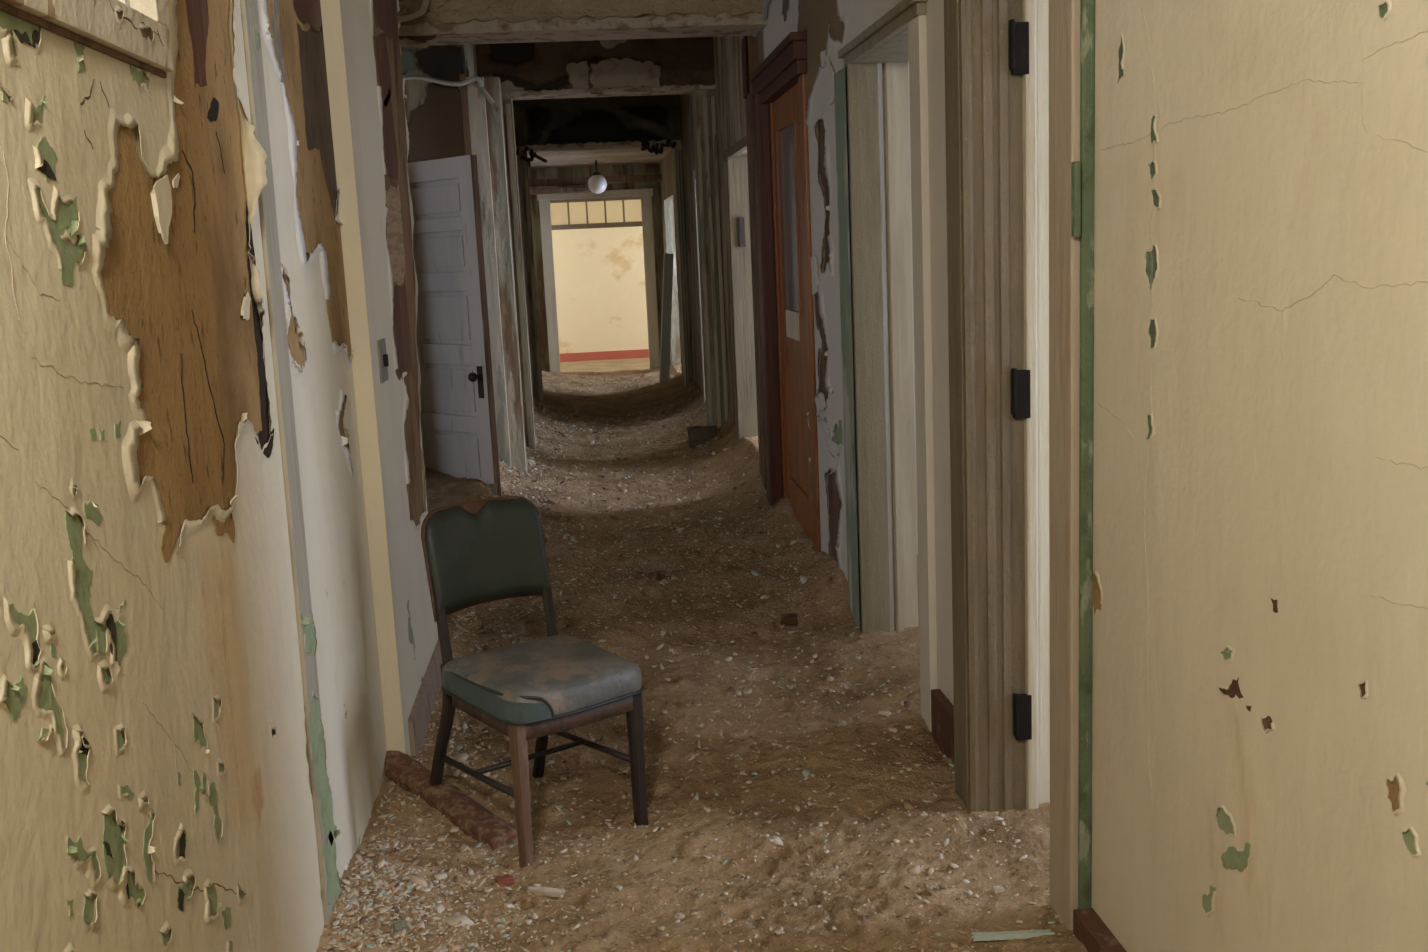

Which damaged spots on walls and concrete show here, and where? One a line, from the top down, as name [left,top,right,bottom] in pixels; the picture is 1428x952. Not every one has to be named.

crack [1095,30,1428,153]
flaking render [0,0,356,563]
flaking render [369,0,767,532]
flaking render [797,0,849,570]
crack [1239,275,1428,364]
peeling [0,596,91,794]
peeling [65,477,128,694]
peeling [66,784,156,933]
peeling [159,694,246,952]
peeling [308,690,349,916]
spalling [1218,644,1276,734]
flaking render [1386,772,1422,859]